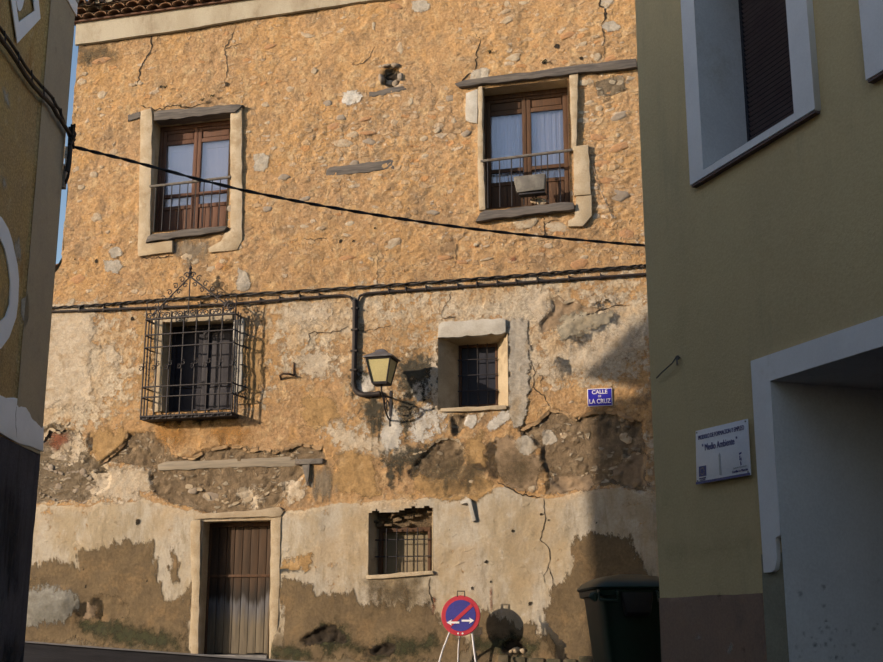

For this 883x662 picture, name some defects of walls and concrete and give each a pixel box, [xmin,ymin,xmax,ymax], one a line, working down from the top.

crack [136,36,207,111]
crack [224,26,242,82]
crack [598,0,607,57]
flaking render [513,217,568,232]
flaking render [181,253,228,272]
spalling [37,297,651,514]
water stain [348,348,484,490]
crack [526,360,551,408]
crack [498,483,553,587]
peeling [273,530,652,662]